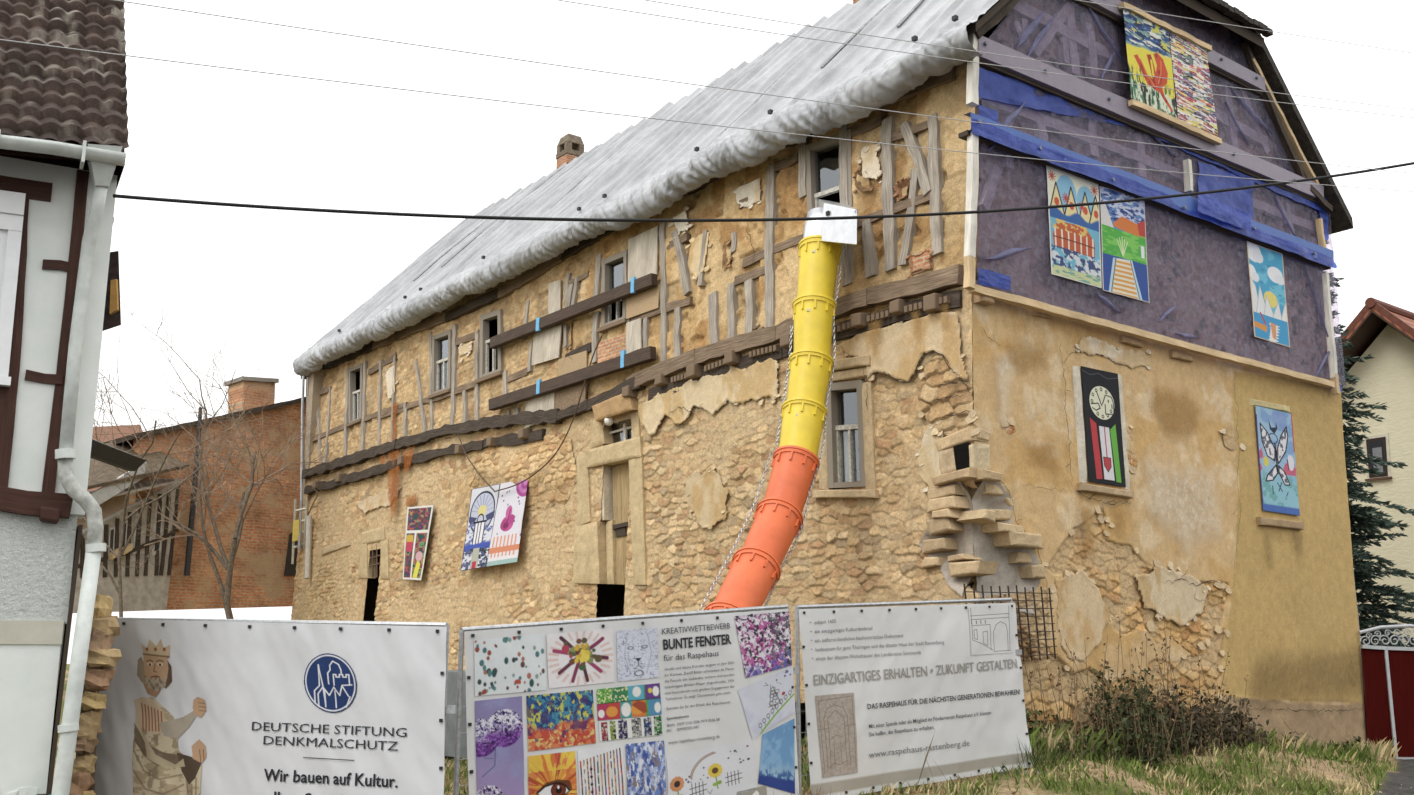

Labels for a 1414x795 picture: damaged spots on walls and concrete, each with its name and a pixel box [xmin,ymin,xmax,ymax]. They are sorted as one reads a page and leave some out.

peeling [638,358,781,435]
spalling [841,312,1232,738]